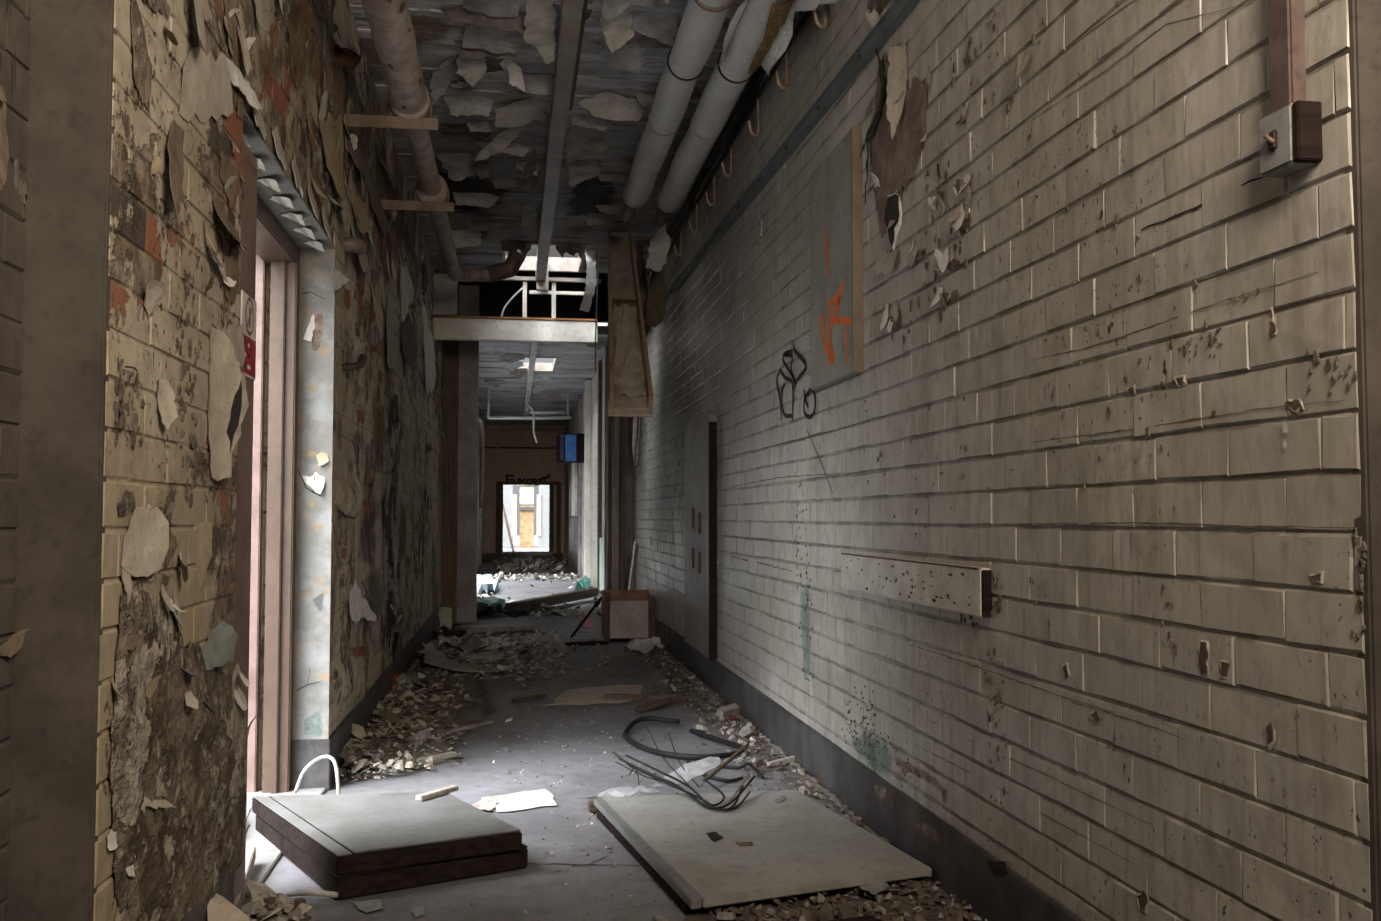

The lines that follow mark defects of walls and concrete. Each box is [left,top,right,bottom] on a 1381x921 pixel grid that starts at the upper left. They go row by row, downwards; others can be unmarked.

peeling [114,0,439,658]
peeling [556,242,586,259]
peeling [570,91,643,130]
peeling [862,45,972,345]
spalling [950,17,1045,126]
peeling [106,490,258,921]